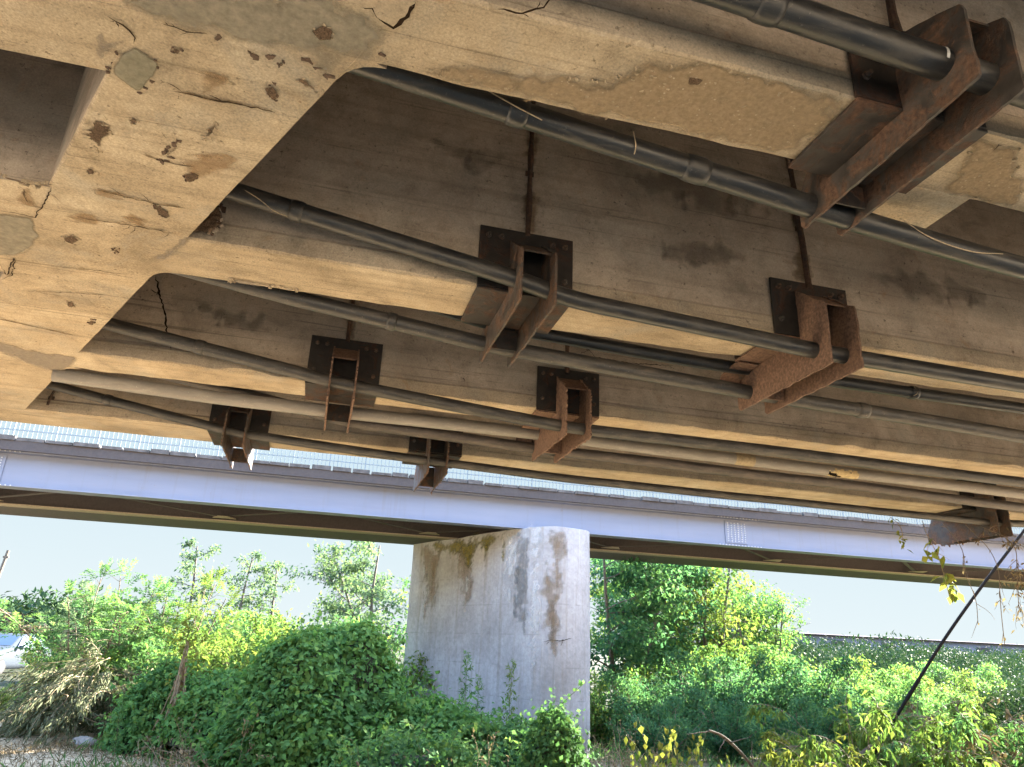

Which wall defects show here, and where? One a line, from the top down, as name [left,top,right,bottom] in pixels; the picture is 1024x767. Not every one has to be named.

crack [109,17,136,42]
spalling [312,23,335,40]
crack [501,0,550,16]
corrosion [885,0,903,32]
spalling [265,82,279,102]
spalling [82,121,113,154]
corrosion [525,131,537,236]
crack [4,191,52,218]
corrosion [792,214,813,289]
crack [152,278,171,348]
water stain [501,529,559,650]